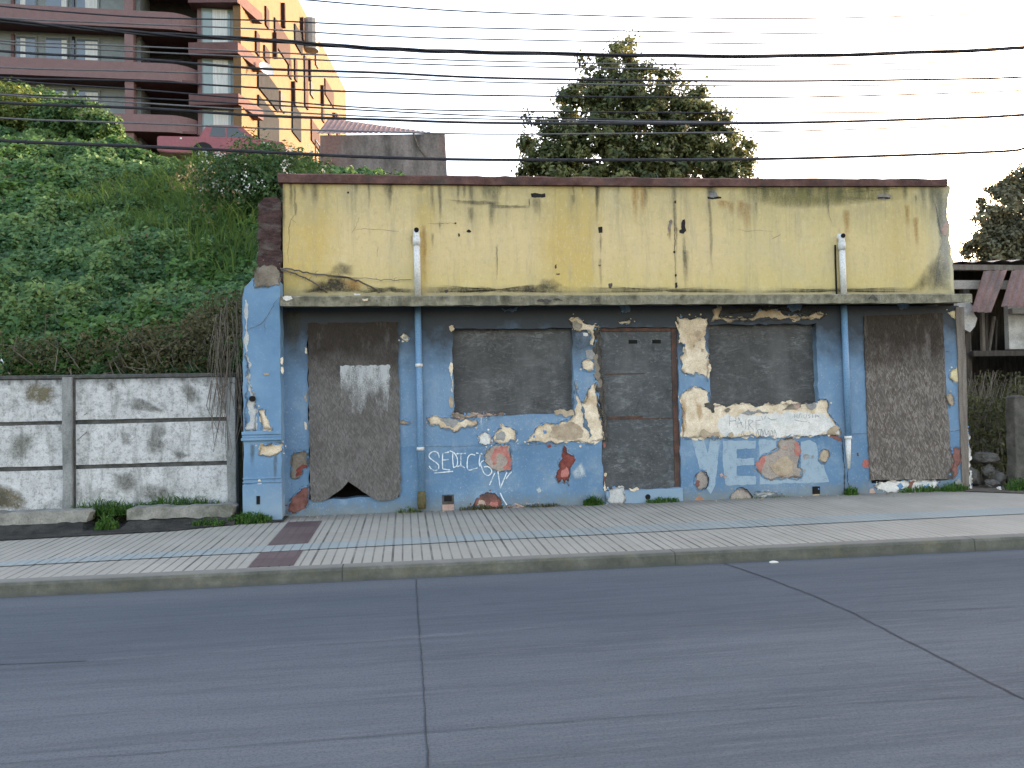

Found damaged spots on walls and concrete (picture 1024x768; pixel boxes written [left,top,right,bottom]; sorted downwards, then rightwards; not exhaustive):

water stain [761,187,873,204]
water stain [304,267,355,297]
water stain [441,284,551,292]
peeling [243,300,310,515]
peeling [426,314,608,486]
peeling [675,304,843,501]
peeling [868,420,973,493]
spalling [470,490,539,508]